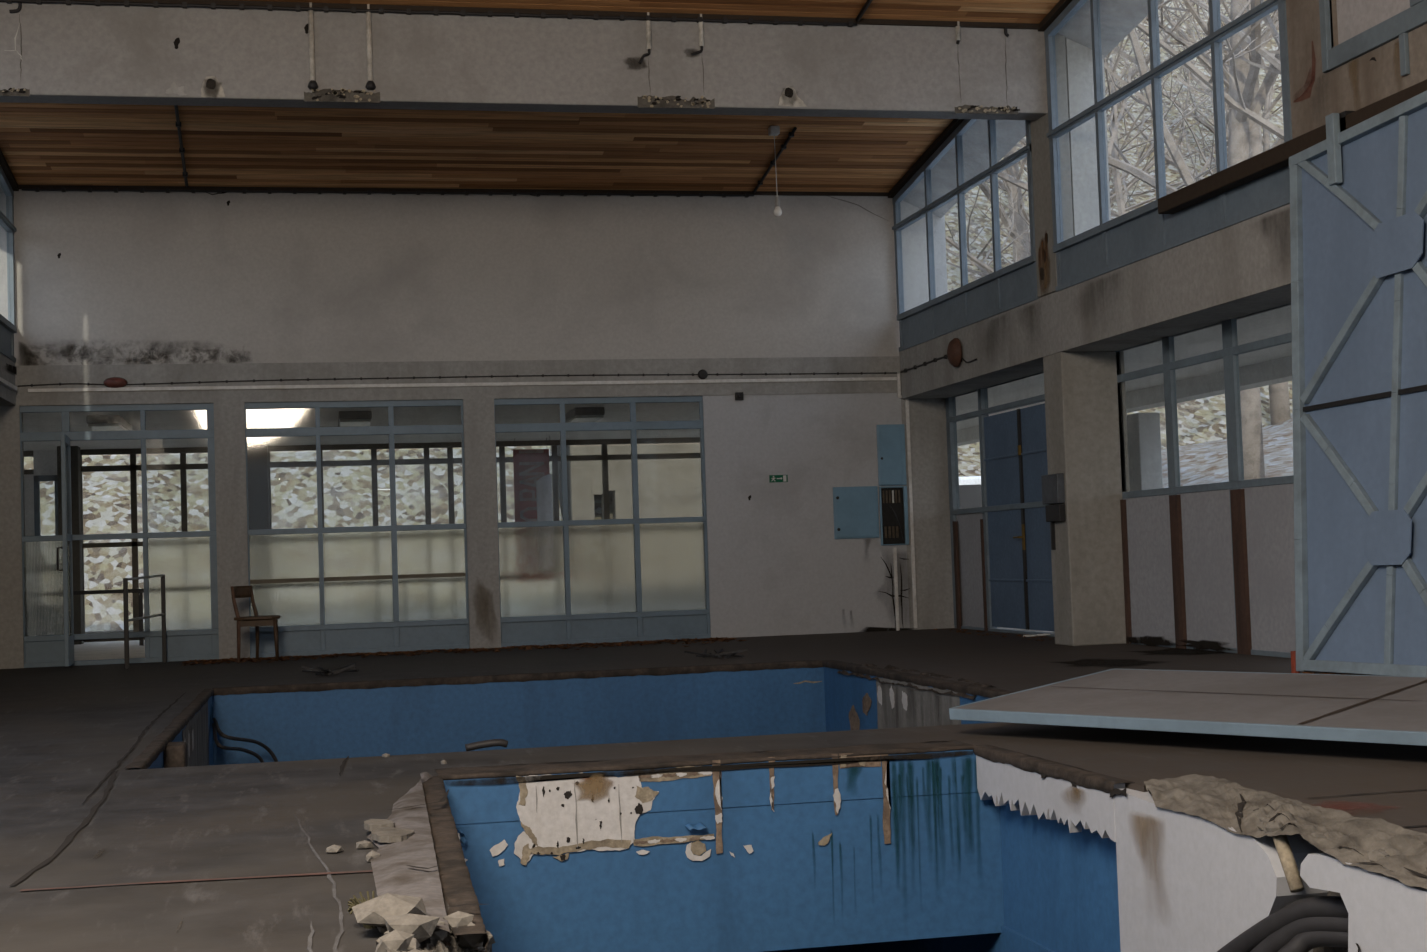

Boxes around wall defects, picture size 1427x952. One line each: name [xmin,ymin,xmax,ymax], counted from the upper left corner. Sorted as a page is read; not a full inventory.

damp [20,344,38,366]
damp [893,760,977,821]